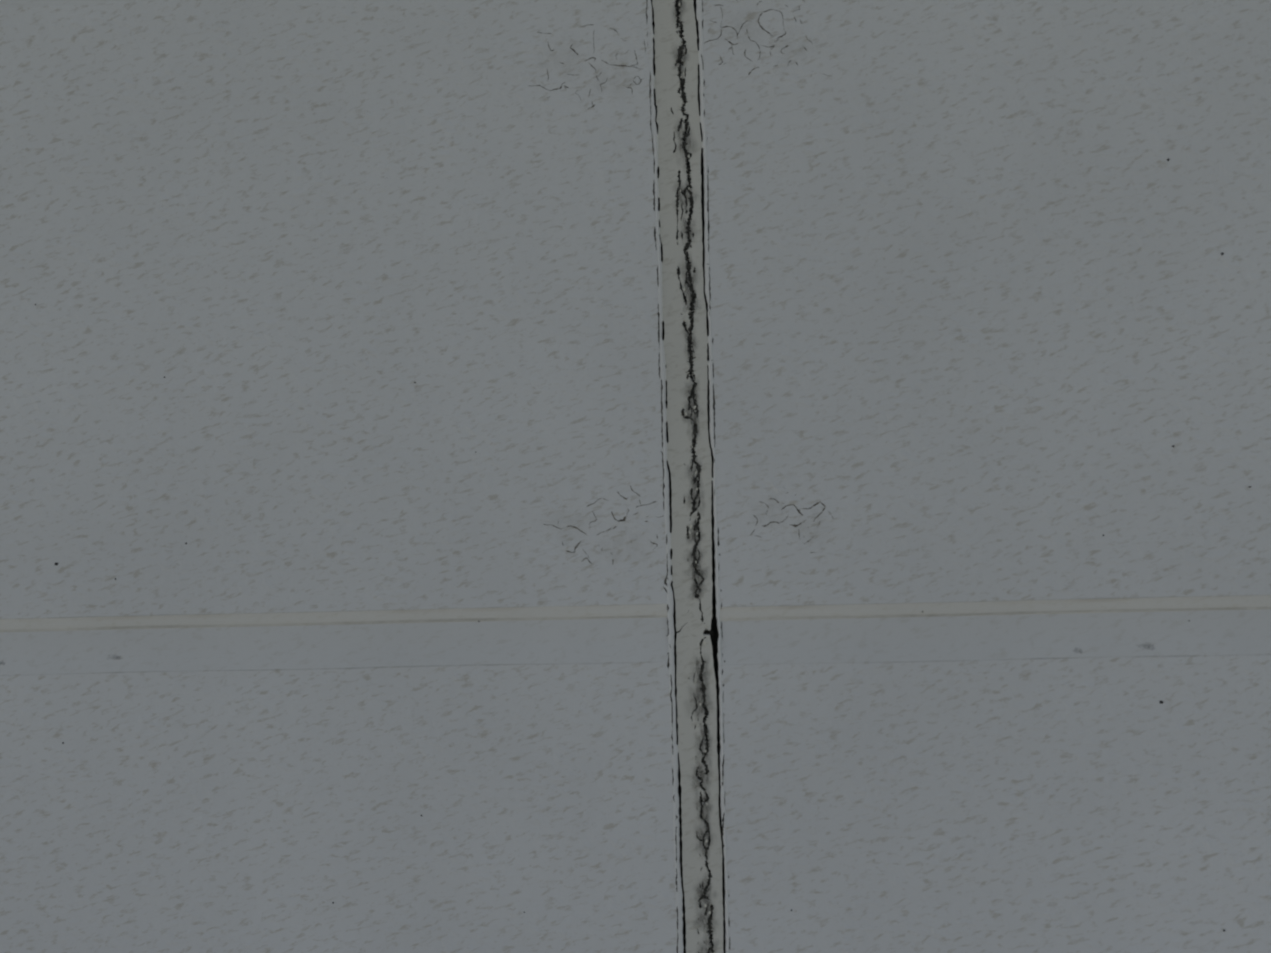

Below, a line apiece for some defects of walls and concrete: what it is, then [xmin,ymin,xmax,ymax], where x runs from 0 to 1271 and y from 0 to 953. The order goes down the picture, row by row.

crack [534,0,834,953]